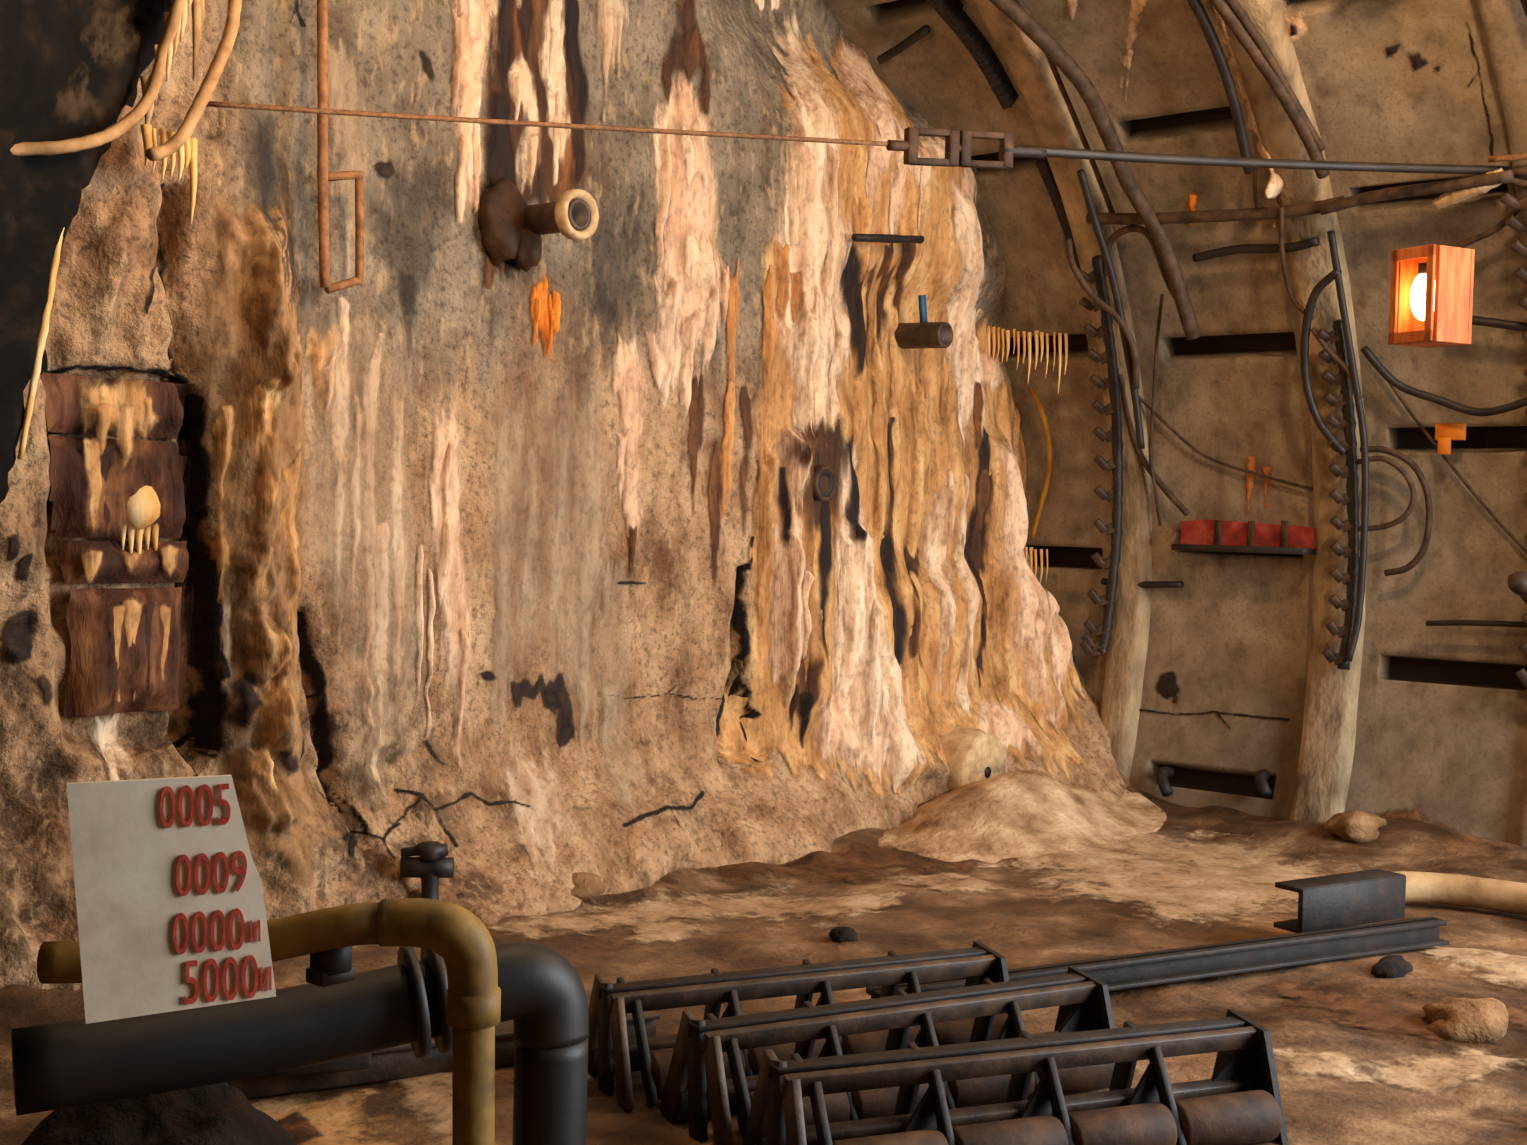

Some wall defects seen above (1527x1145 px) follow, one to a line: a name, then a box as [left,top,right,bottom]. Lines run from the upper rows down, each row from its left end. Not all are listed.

leakage [454,0,498,222]
leakage [510,0,570,184]
spalling [2,608,38,663]
spalling [8,533,33,582]
spalling [38,675,52,706]
crack [297,611,530,859]
spalling [482,671,576,746]
crack [608,536,762,827]
corrosion [964,382,993,687]